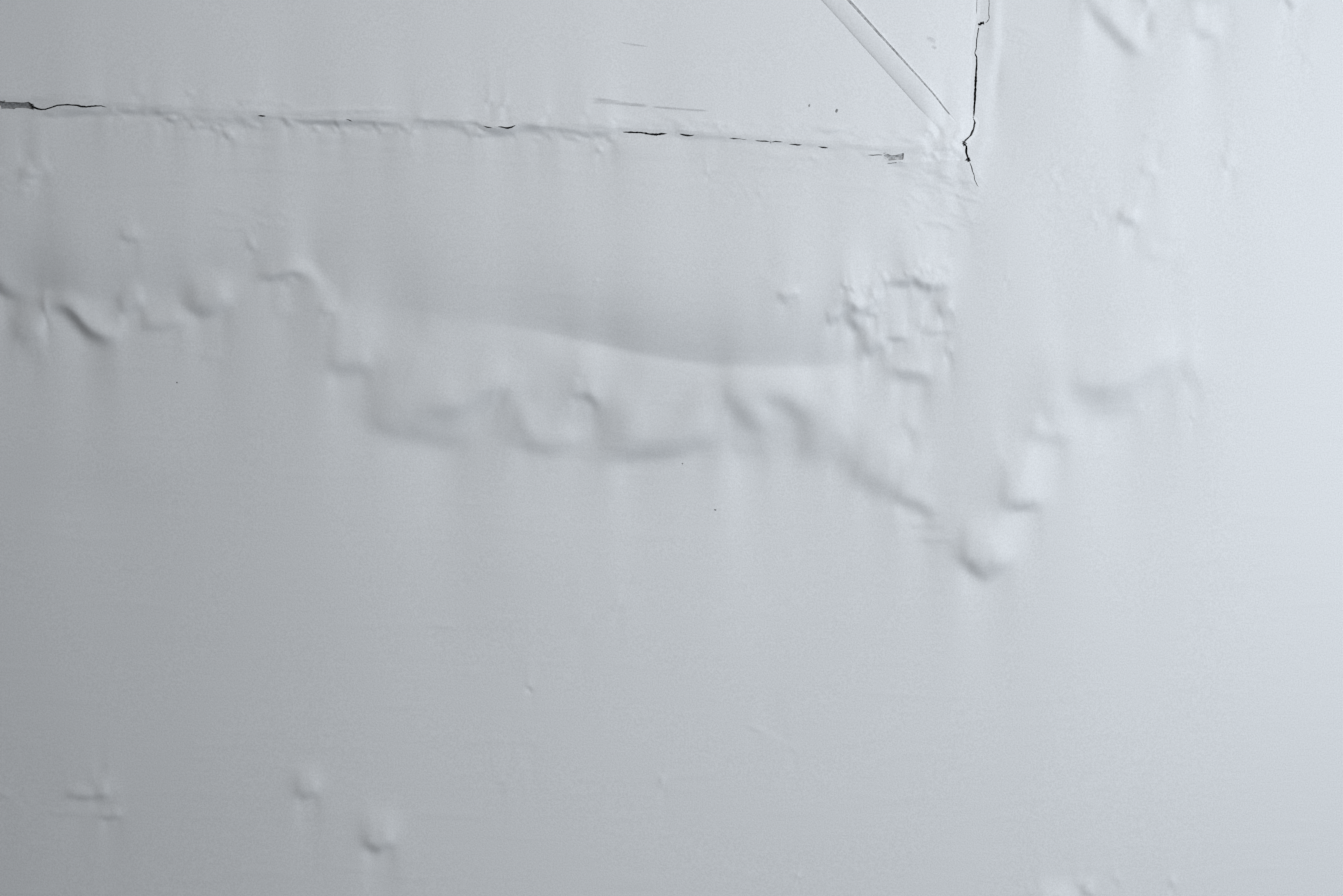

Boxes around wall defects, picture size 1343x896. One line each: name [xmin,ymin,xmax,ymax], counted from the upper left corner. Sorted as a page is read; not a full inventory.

crack [0,97,111,114]
crack [959,21,984,192]
crack [478,120,521,133]
crack [619,128,832,152]
crack [864,151,906,168]